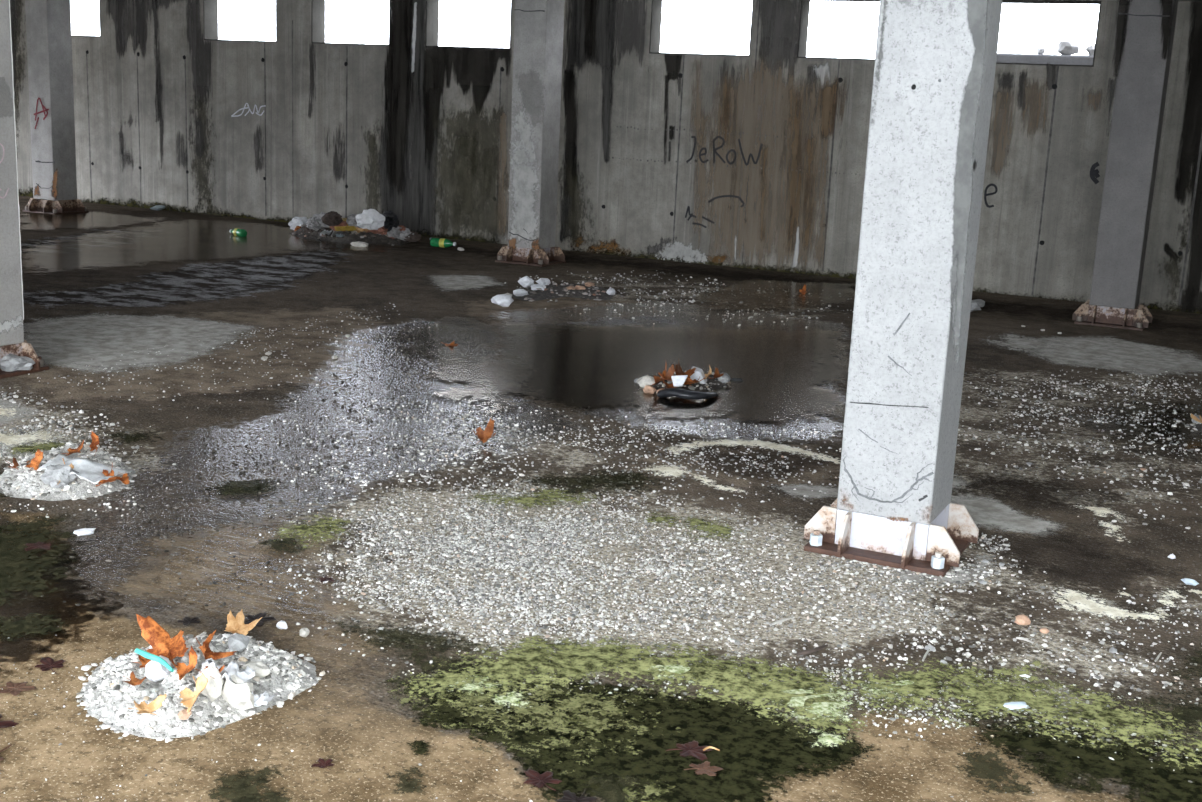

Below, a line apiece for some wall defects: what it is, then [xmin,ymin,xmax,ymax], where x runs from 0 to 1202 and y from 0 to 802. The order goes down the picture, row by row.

water stain [81,0,292,223]
water stain [308,43,316,117]
water stain [326,130,345,182]
water stain [364,0,511,256]
corrosion [571,234,631,256]
water stain [559,0,856,290]
corrosion [691,59,847,267]
water stain [1139,0,1202,331]
crack [843,455,934,503]